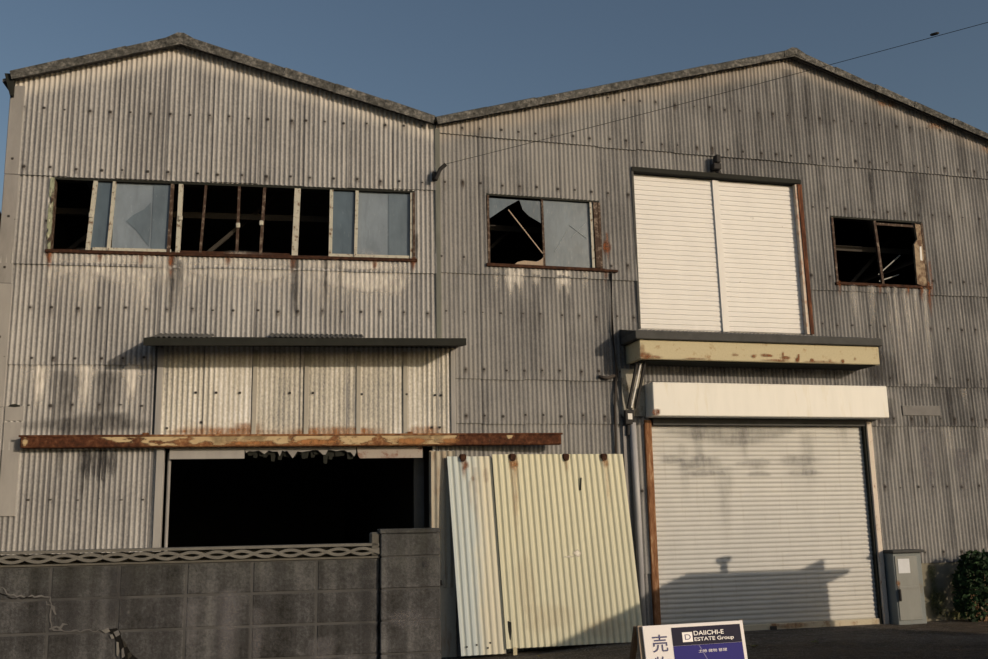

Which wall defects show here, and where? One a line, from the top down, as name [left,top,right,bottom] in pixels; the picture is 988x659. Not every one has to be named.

water stain [494,268,540,291]
water stain [556,270,570,292]
water stain [32,365,50,402]
water stain [68,365,141,403]
rust [296,428,367,444]
water stain [81,450,114,490]
crack [0,587,103,632]
crack [374,565,382,659]